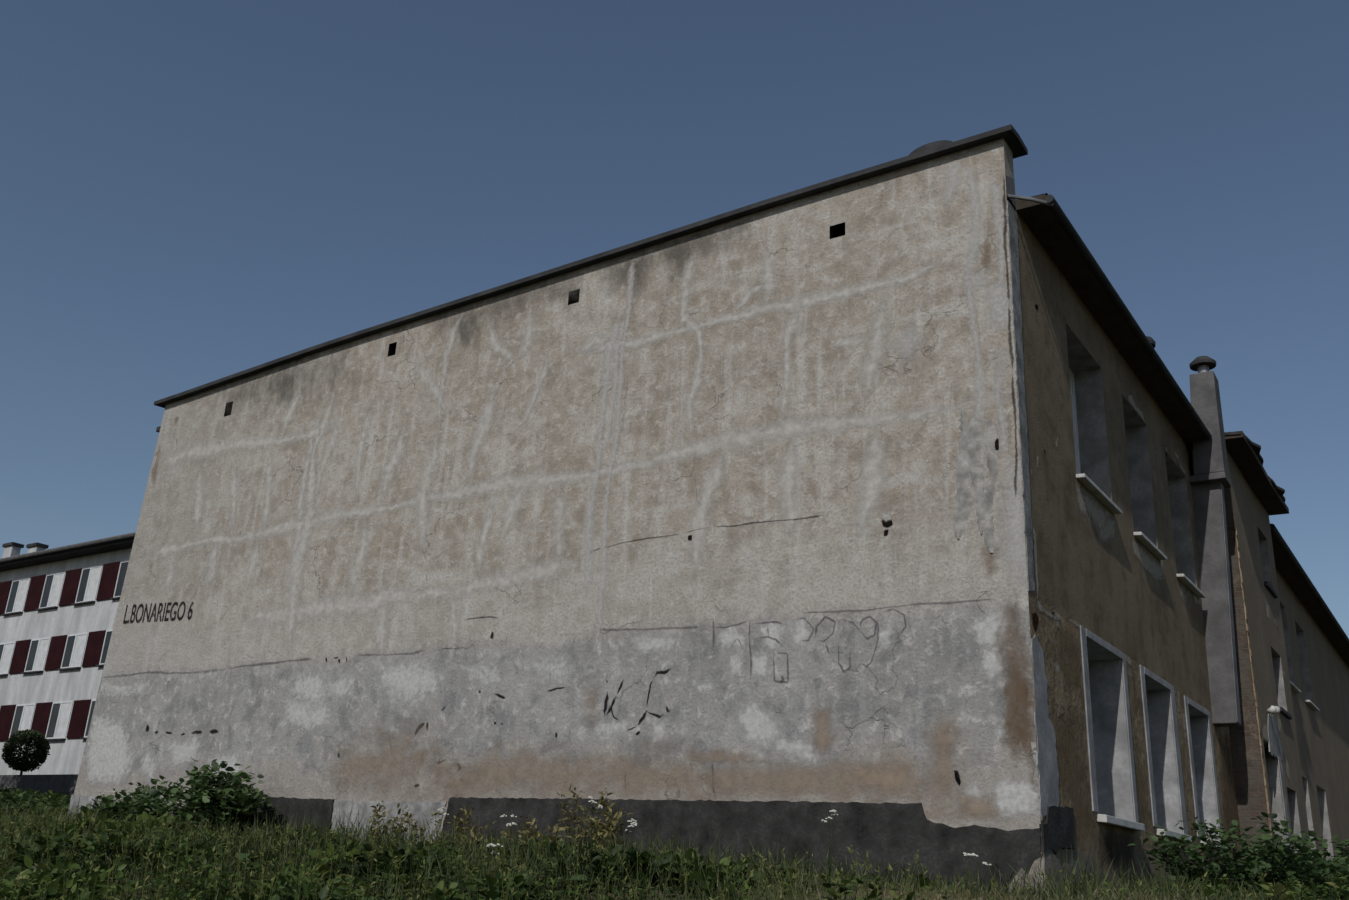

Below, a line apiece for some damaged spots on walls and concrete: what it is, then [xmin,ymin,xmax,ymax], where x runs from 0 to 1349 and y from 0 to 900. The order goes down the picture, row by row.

peeling [1076,483,1115,542]
peeling [1132,541,1164,580]
peeling [972,612,1014,681]